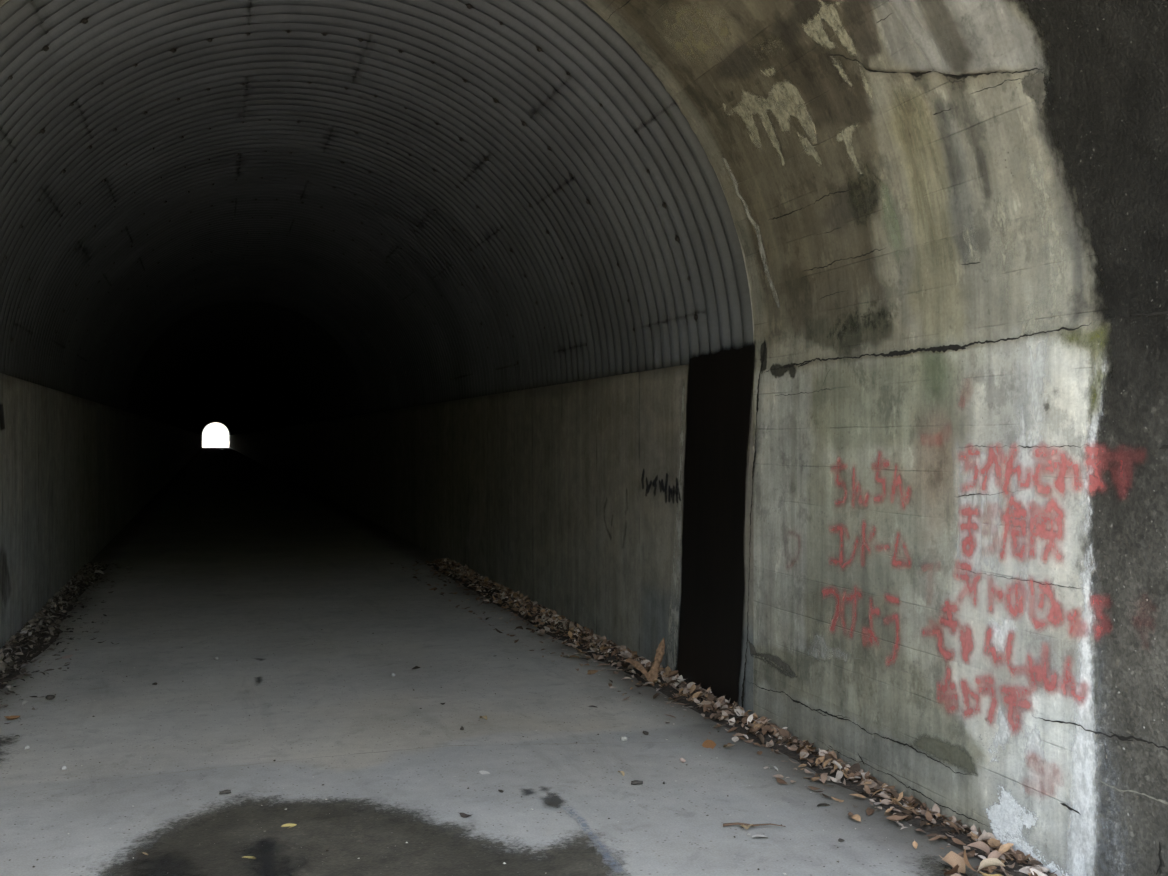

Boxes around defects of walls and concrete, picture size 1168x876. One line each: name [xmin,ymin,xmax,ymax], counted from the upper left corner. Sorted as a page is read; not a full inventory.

peeling [804,0,875,105]
crack [831,54,1042,115]
peeling [722,68,822,166]
peeling [836,125,859,170]
crack [741,323,1091,829]
crack [1040,718,1168,750]
crack [1094,779,1168,805]
water stain [101,794,624,876]
crack [1155,842,1163,875]